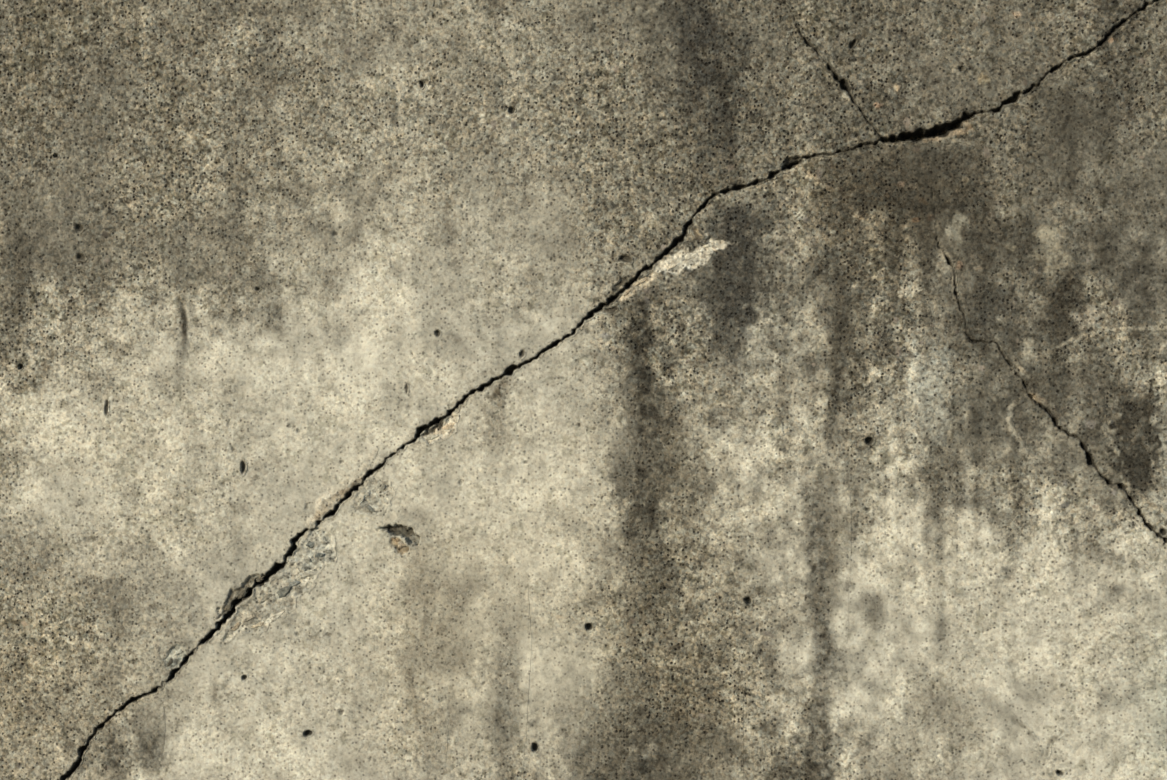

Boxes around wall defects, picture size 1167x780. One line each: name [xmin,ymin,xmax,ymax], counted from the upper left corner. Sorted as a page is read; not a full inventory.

crack [58,168,788,780]
damp [549,0,779,780]
spalling [610,227,735,305]
crack [795,165,866,224]
damp [764,150,1163,780]
crack [778,0,1162,171]
crack [926,167,1167,545]
crack [987,702,1065,766]